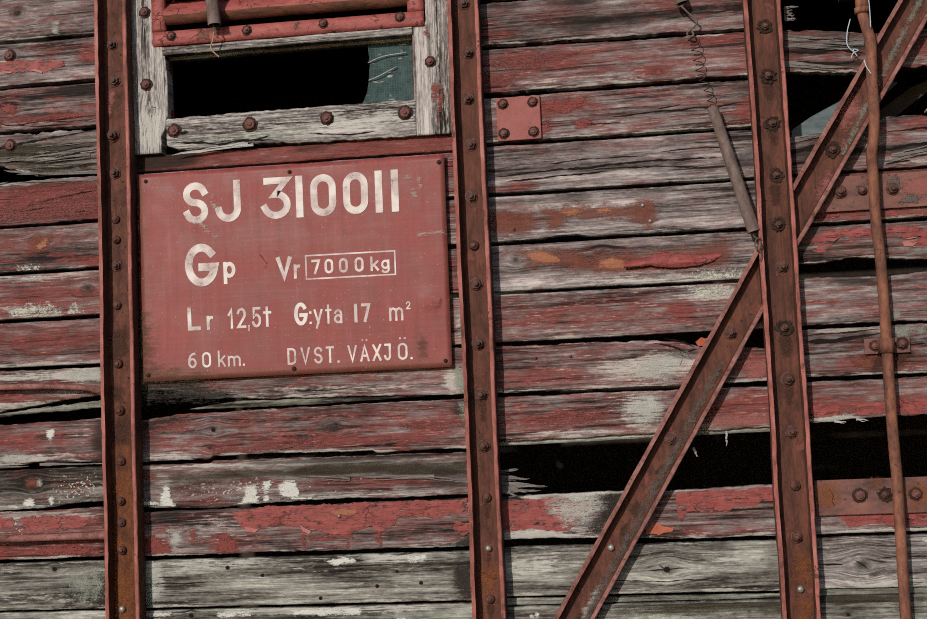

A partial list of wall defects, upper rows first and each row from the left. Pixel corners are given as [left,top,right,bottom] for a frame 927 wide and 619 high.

peeling [0,59,64,73]
crack [0,117,94,170]
crack [3,190,95,215]
peeling [882,209,927,246]
peeling [812,228,872,253]
corrosion [520,238,732,274]
peeling [599,252,722,269]
corrosion [852,354,882,370]
corrosion [893,352,910,367]
peeling [0,515,91,532]
peeling [233,498,468,535]
peeling [645,487,773,535]